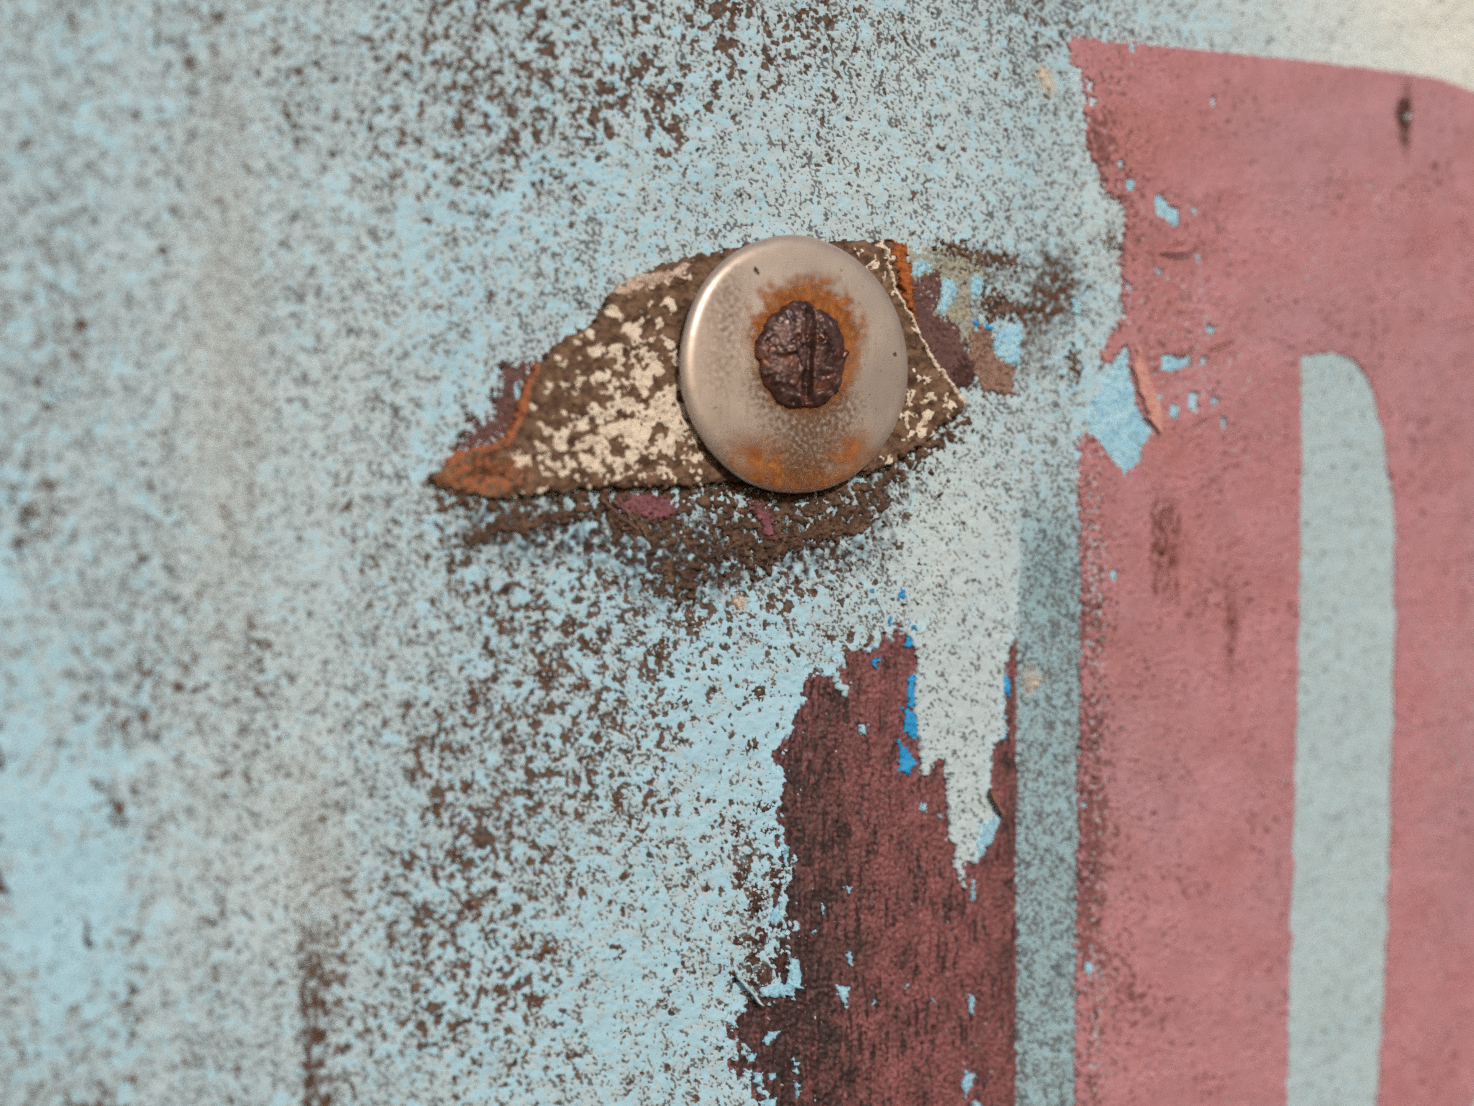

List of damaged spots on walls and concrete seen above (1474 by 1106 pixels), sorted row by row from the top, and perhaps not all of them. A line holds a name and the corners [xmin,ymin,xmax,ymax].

spalling [1153,194,1197,227]
rust [884,239,919,322]
rust [751,278,864,414]
peeling [1058,326,1235,476]
rust [739,437,864,490]
peeling [416,238,1082,901]
peeling [728,800,803,1006]
peeling [503,937,560,957]
peeling [485,977,550,1016]
peeling [835,984,851,1009]
peeling [746,1031,802,1106]
peeling [961,1070,981,1106]